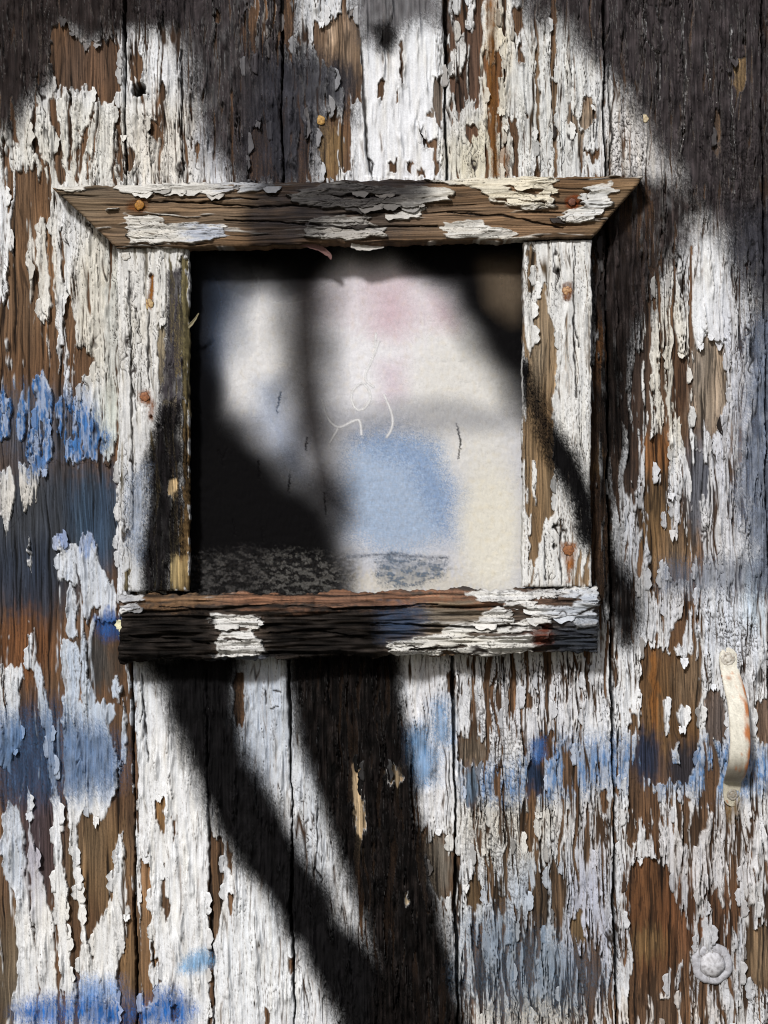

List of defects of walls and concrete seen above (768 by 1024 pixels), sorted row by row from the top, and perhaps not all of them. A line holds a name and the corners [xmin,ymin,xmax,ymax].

peeling [0,16,282,1024]
peeling [238,0,363,183]
peeling [115,236,768,1024]
peeling [295,0,643,569]
corrosion [561,542,576,581]